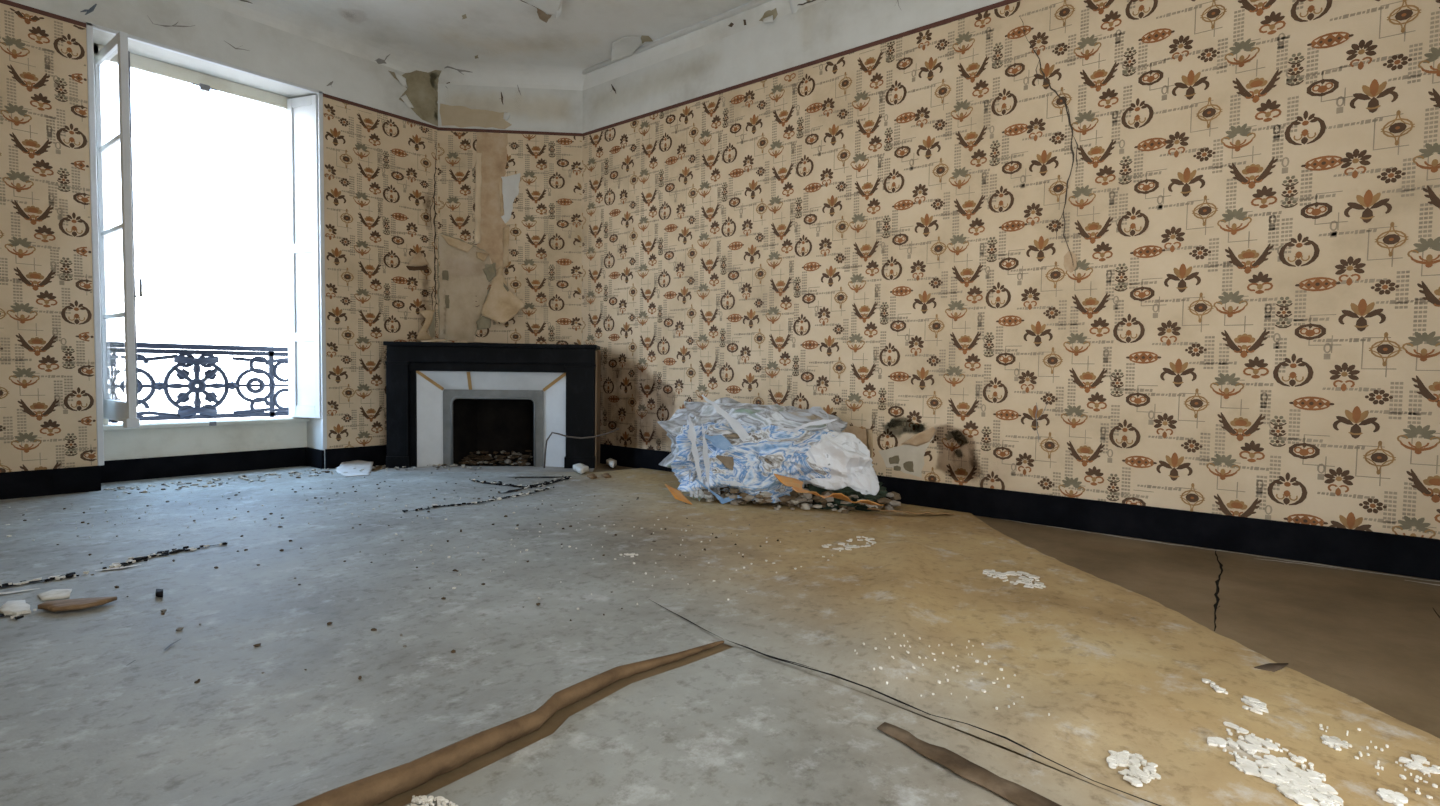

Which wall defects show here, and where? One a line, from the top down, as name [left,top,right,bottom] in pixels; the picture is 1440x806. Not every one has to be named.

peeling [523,0,563,23]
peeling [728,0,810,27]
peeling [389,70,512,129]
peeling [442,270,450,308]
crack [1213,549,1223,631]